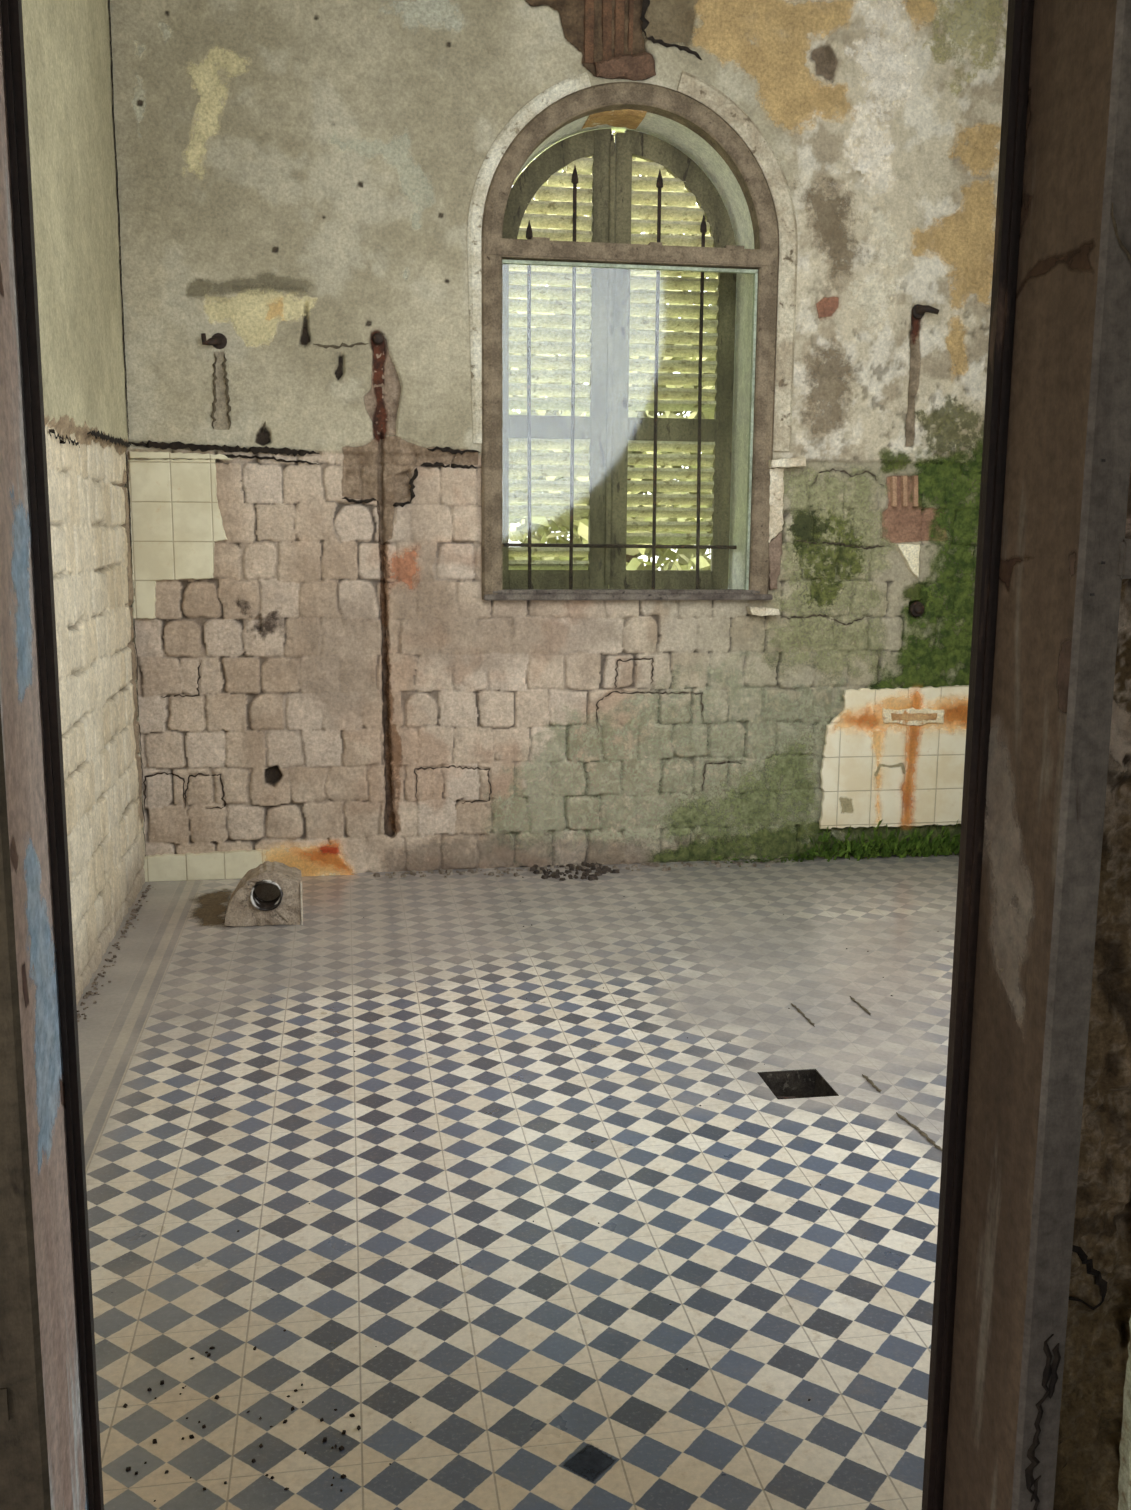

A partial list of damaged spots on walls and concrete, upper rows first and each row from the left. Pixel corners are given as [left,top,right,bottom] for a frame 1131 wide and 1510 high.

spalling [525,0,656,81]
peeling [692,0,852,131]
peeling [913,124,1001,374]
peeling [205,289,315,347]
corrosion [911,314,921,344]
corrosion [842,691,968,825]
corrosion [267,843,352,877]
crack [1069,1245,1108,1310]
crack [1025,1334,1061,1510]
peeling [1118,1317,1131,1510]